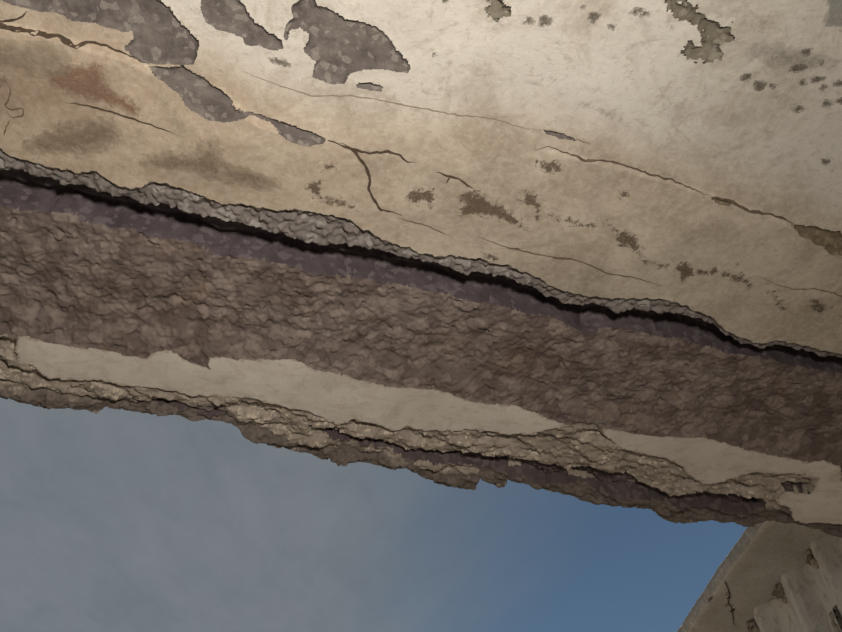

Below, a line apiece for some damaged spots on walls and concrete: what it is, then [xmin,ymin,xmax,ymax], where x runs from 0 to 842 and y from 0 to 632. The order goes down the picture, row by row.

crack [0,11,150,65]
peeling [200,0,411,85]
peeling [484,0,511,22]
peeling [664,0,734,63]
peeling [3,0,326,147]
peeling [356,82,383,92]
crack [64,101,172,133]
crack [243,71,796,236]
crack [483,238,660,286]
crack [756,275,842,297]
spalling [0,149,842,538]
crack [724,581,736,626]